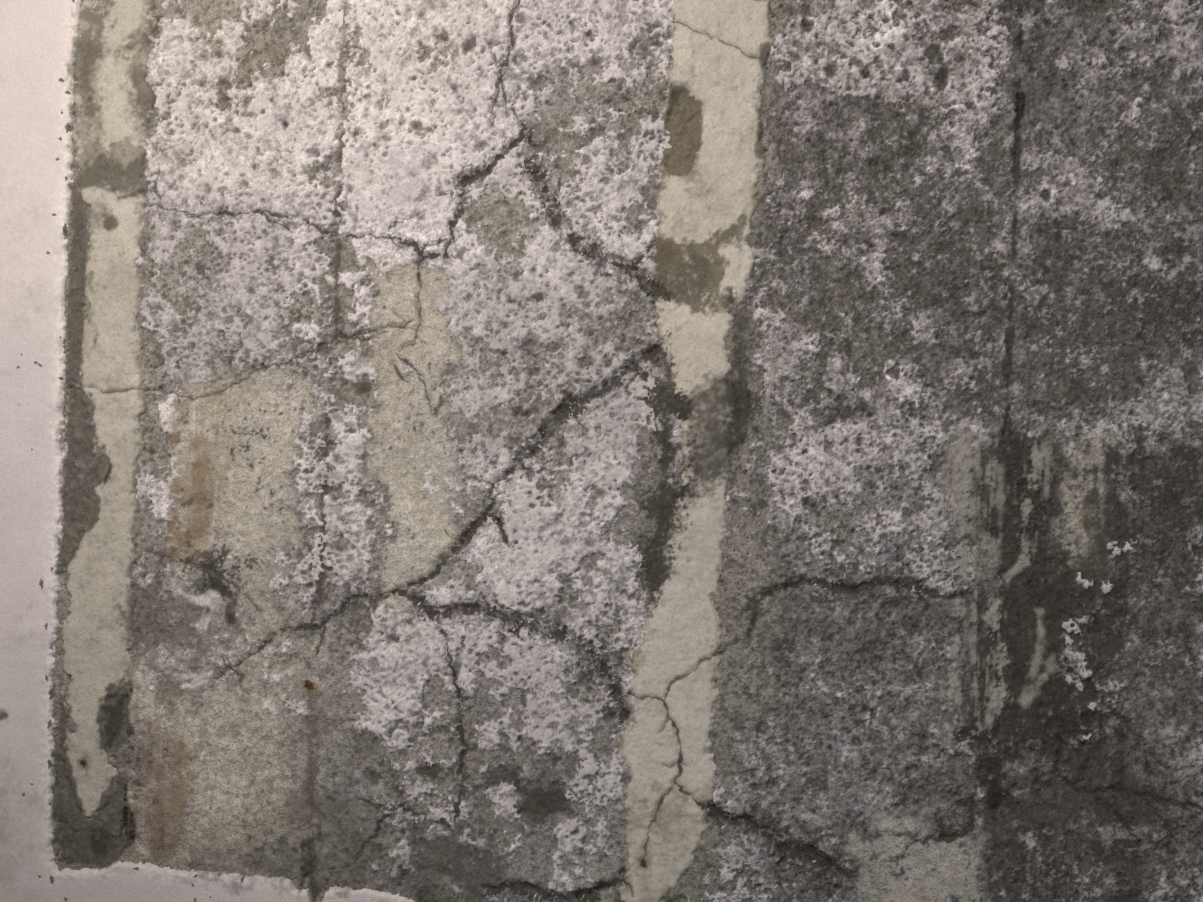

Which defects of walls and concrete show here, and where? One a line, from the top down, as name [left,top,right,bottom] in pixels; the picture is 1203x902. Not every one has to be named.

peeling [770,0,1013,115]
crack [150,0,670,407]
peeling [143,0,702,466]
spalling [39,177,111,589]
spalling [45,675,136,870]
peeling [279,350,377,604]
peeling [357,604,620,855]
peeling [495,370,657,652]
crack [218,343,983,902]
peeling [767,411,983,590]
crack [875,730,1203,861]
crack [1065,666,1171,769]